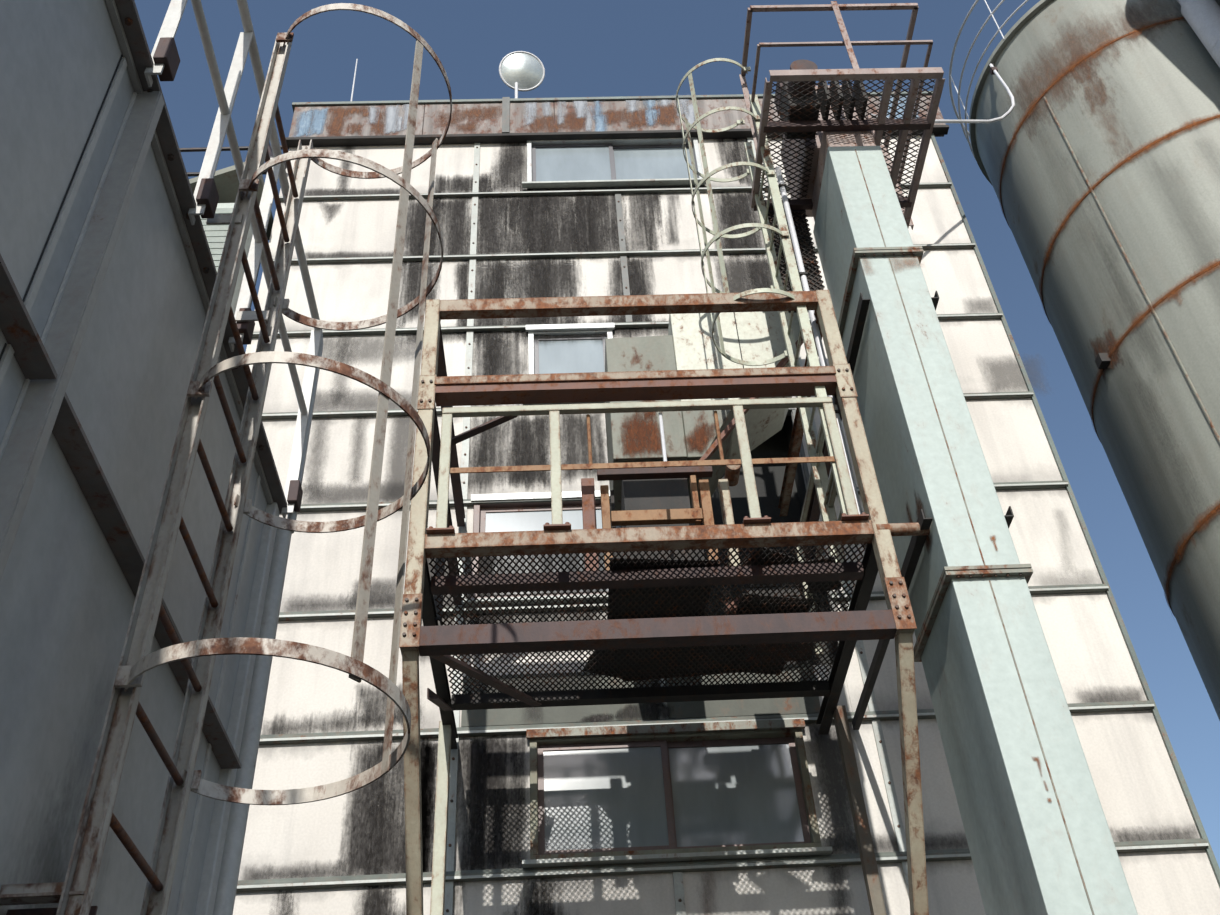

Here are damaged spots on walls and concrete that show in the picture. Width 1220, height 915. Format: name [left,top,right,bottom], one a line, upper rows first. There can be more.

rust [328,106,386,136]
rust [530,105,677,132]
damp [305,143,677,340]
damp [717,138,773,293]
rust [1039,114,1220,313]
rust [1090,261,1220,429]
rust [622,400,662,457]
rust [686,422,716,452]
damp [246,744,406,915]
damp [420,740,438,872]
damp [457,735,527,871]
damp [514,878,563,915]